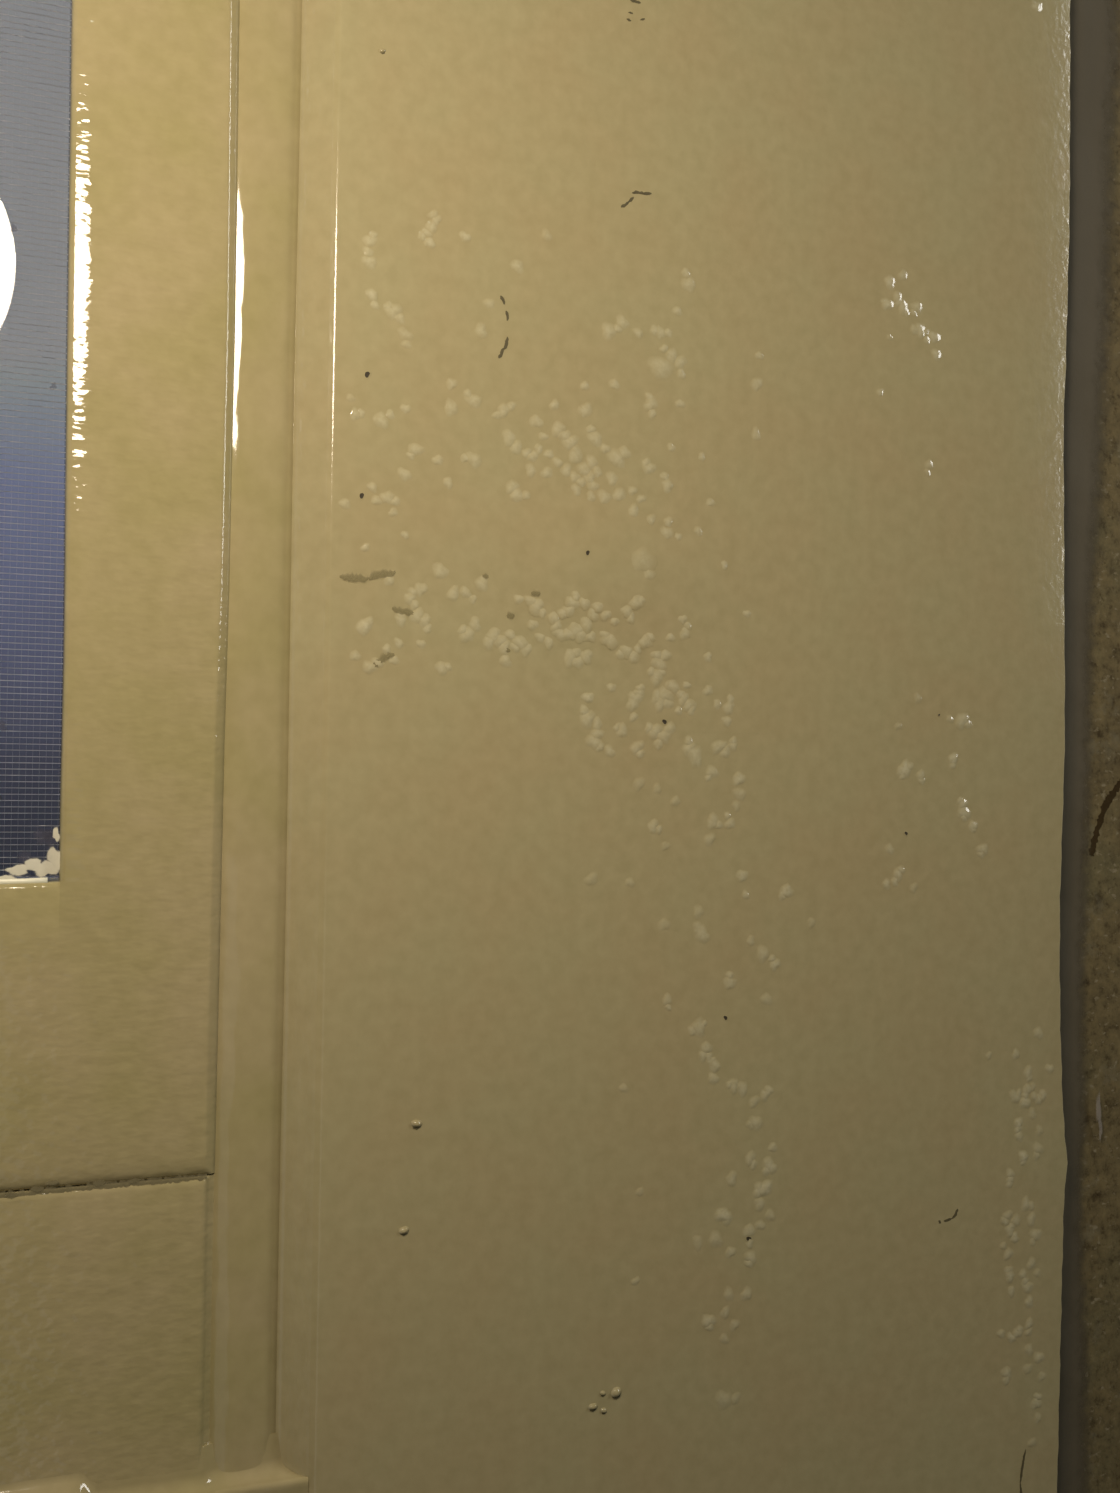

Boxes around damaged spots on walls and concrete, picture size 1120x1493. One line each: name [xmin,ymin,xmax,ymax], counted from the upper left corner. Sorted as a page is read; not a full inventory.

crack [1089,781,1120,856]